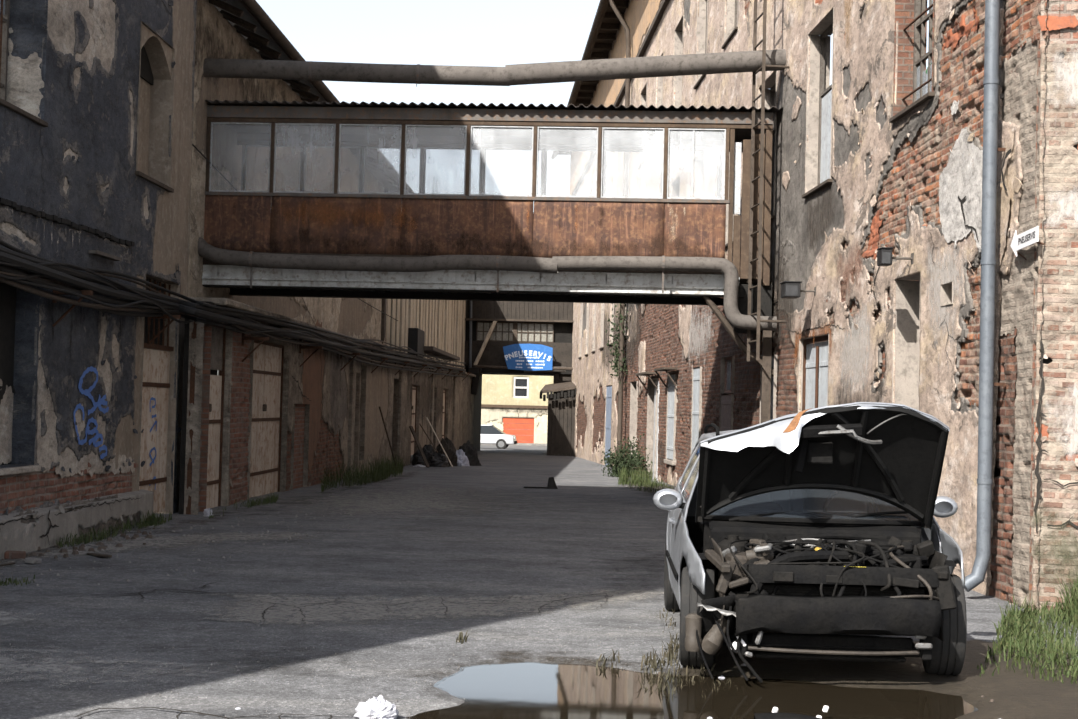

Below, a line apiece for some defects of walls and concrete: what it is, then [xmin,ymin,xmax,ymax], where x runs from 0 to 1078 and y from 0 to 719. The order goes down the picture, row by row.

peeling [6,28,44,119]
peeling [45,0,119,87]
peeling [129,90,137,156]
flaking render [576,0,985,483]
crack [958,195,979,242]
flaking render [989,0,1078,611]
flaking render [0,312,146,526]
crack [99,582,454,623]